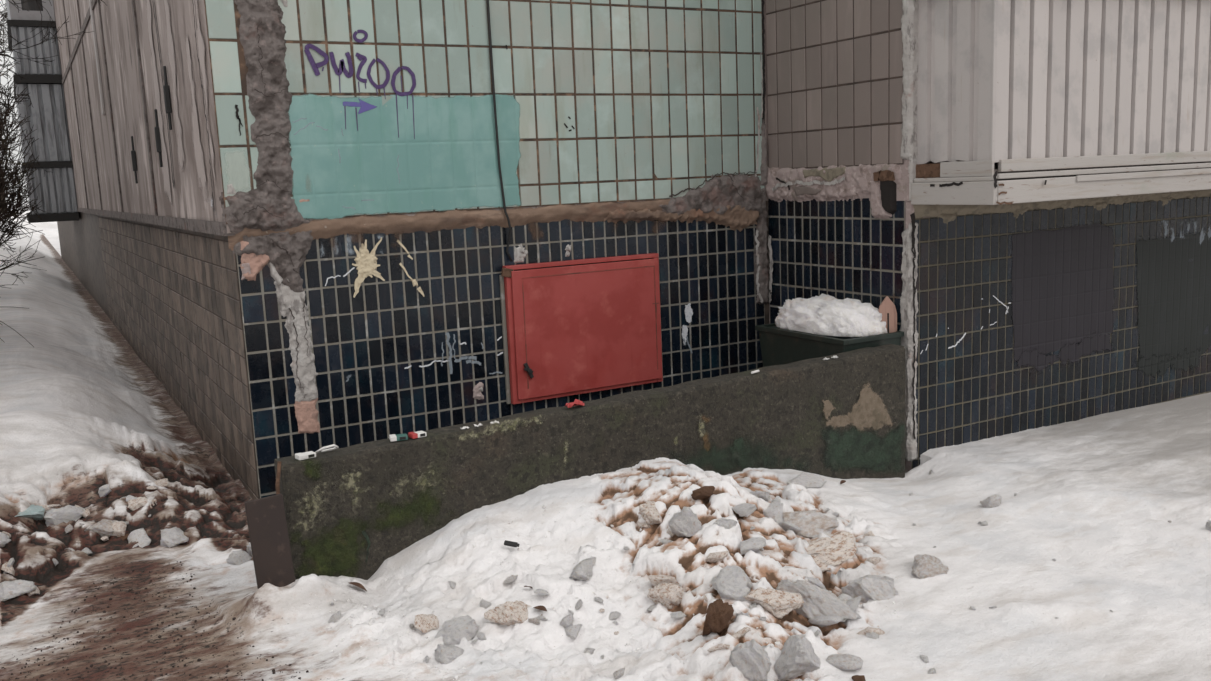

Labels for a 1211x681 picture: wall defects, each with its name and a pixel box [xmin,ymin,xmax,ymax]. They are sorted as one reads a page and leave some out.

flaking render [233,230,320,433]
peeling [603,0,1211,462]